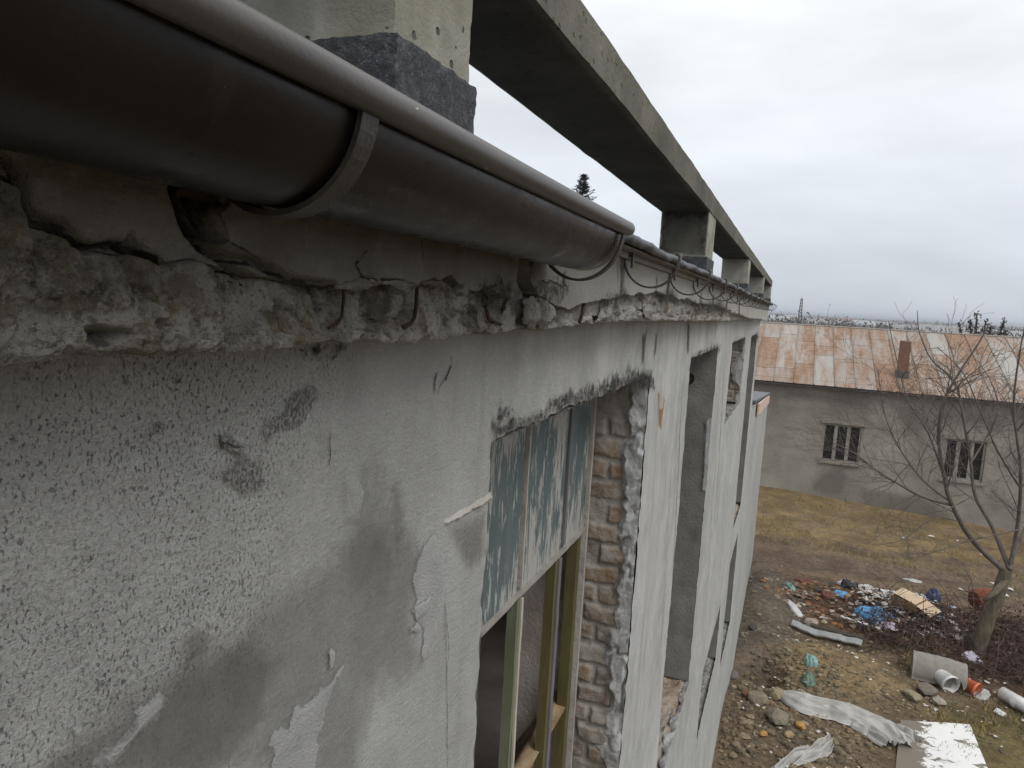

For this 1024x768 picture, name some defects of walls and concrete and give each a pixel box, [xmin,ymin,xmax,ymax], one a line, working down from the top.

crack [27,215,166,271]
crack [189,242,326,290]
spalling [0,180,730,368]
flaking render [492,364,655,768]
flaking render [269,648,344,768]